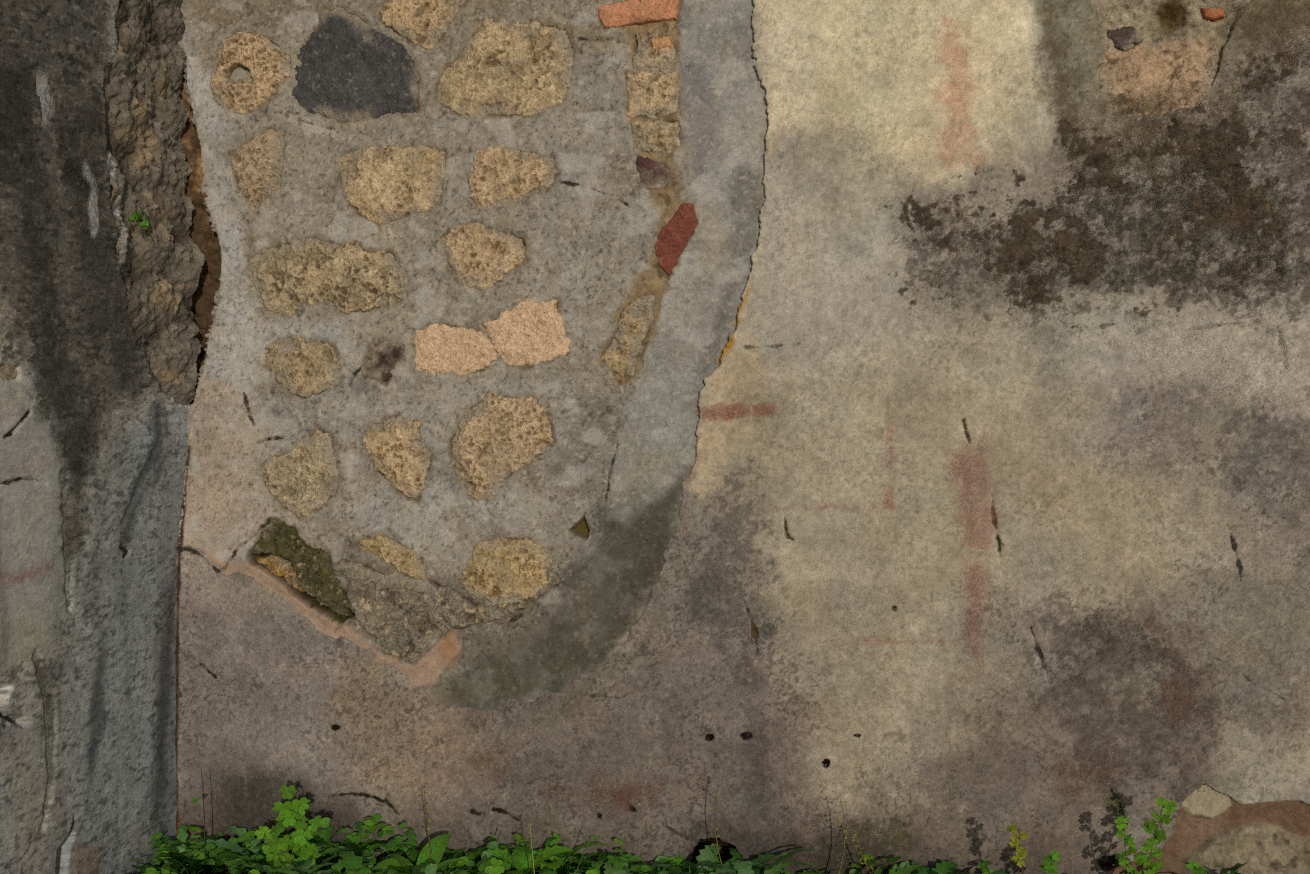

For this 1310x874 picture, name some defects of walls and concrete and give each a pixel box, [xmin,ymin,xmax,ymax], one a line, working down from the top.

flaking render [1091,0,1251,114]
crack [1,477,25,485]
damp [0,59,144,492]
damp [89,404,168,823]
crack [178,69,221,402]
flaking render [102,0,769,711]
flaking render [1111,784,1310,874]